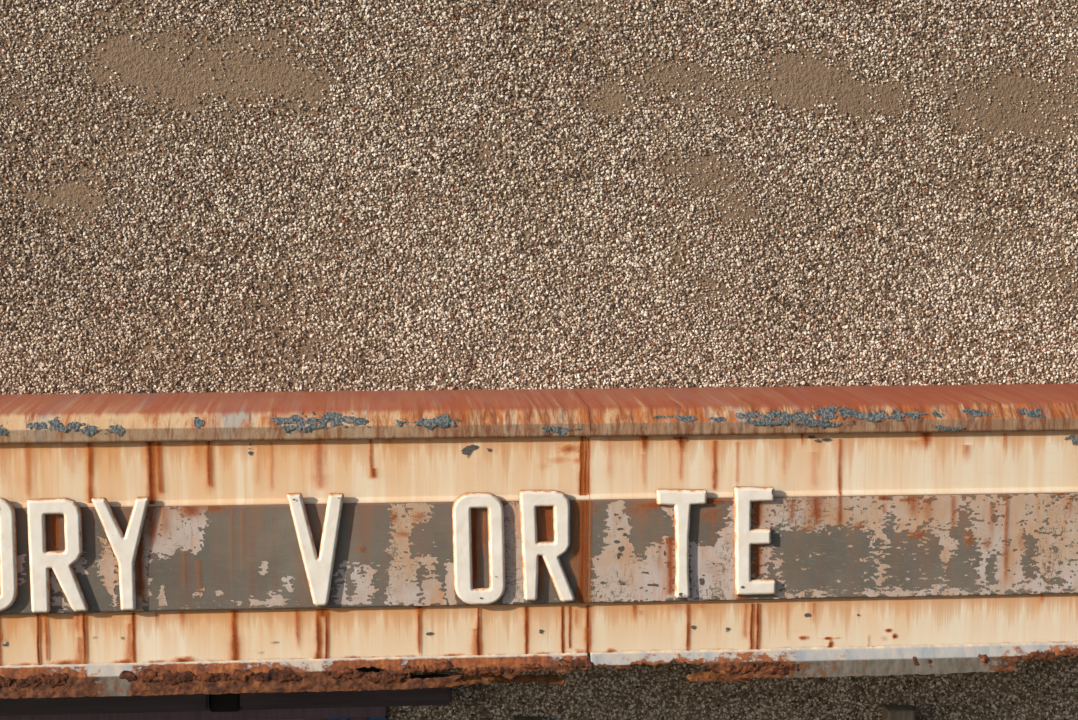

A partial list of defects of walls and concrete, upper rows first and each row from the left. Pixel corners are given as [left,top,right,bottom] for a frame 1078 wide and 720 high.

peeling [26,417,125,440]
peeling [653,405,997,442]
rust [707,440,722,503]
rust [754,502,762,526]
peeling [73,506,211,611]
peeling [330,503,457,606]
peeling [587,489,1078,602]
peeling [192,576,295,607]
rust [738,595,760,649]
rust [0,613,87,688]
rust [724,662,798,675]
rust [1028,642,1078,659]